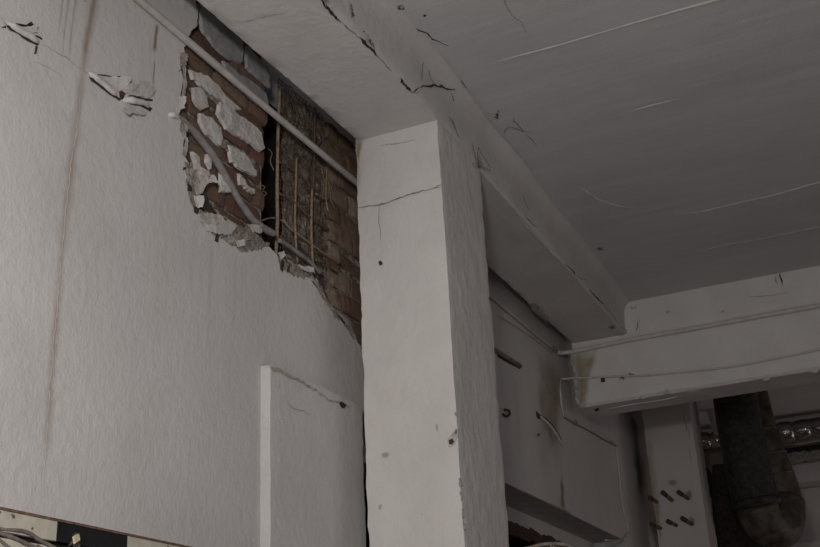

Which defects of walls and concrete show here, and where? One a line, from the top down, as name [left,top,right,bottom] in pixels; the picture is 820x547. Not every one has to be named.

spalling [2,20,42,54]
spalling [89,71,155,115]
crack [321,0,491,168]
spalling [168,0,362,349]
crack [358,184,441,240]
crack [266,364,351,419]